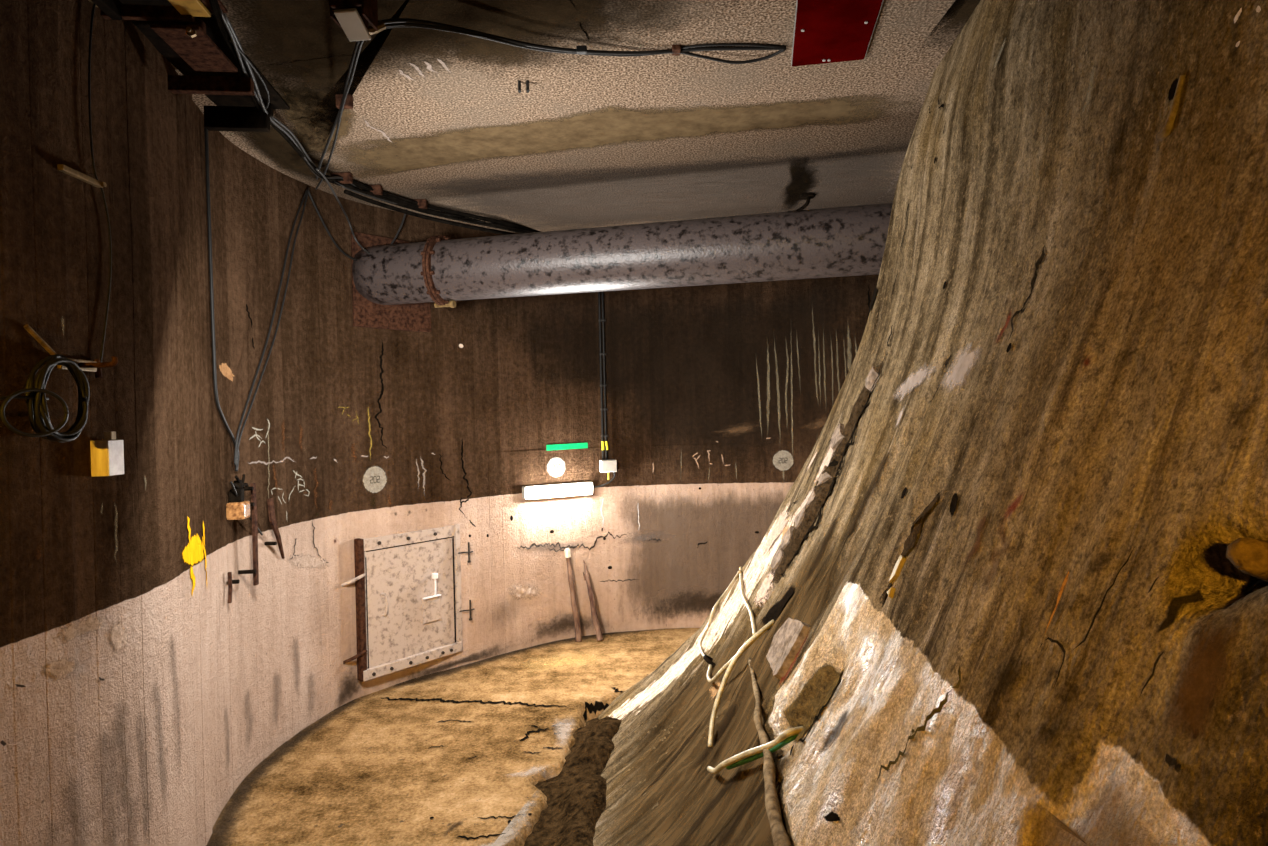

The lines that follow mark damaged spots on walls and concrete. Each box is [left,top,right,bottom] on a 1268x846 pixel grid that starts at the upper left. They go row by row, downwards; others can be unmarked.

crack [1008,246,1045,340]
crack [519,528,661,552]
spalling [754,362,884,684]
spalling [1243,574,1267,594]
crack [381,687,625,759]
crack [877,666,961,780]